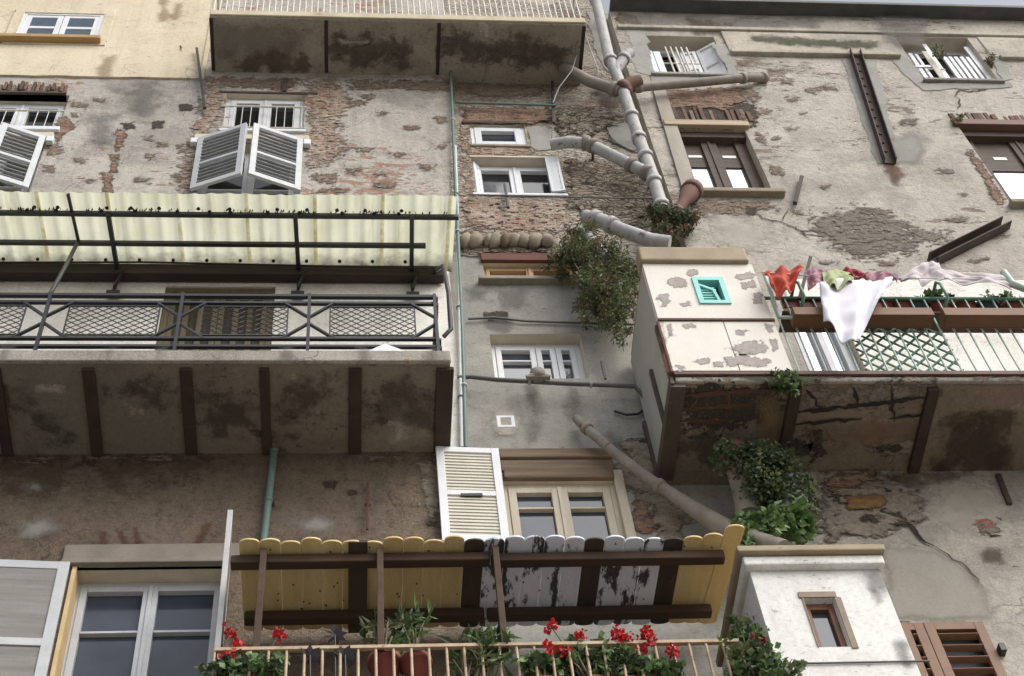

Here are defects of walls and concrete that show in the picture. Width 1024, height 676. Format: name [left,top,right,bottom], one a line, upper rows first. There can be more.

leakage [215,26,312,73]
leakage [329,32,412,69]
leakage [440,29,569,66]
flaking render [40,96,106,173]
flaking render [82,75,573,237]
flaking render [965,149,1007,205]
flaking render [689,197,970,266]
peeling [656,269,698,307]
peeling [675,323,779,384]
leakage [876,411,1013,493]
spalling [791,429,932,545]
crack [906,520,983,586]